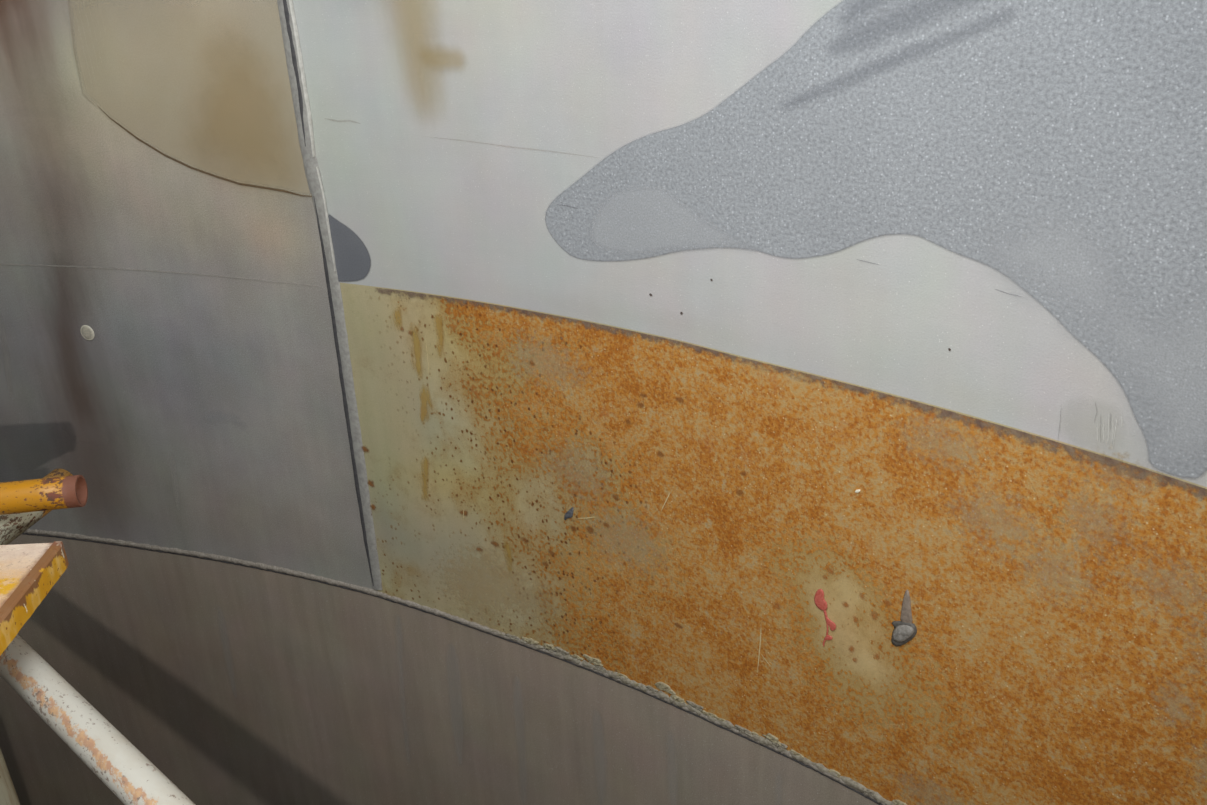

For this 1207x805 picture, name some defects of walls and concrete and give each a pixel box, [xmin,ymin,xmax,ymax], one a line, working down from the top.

corrosion [377,288,1207,805]